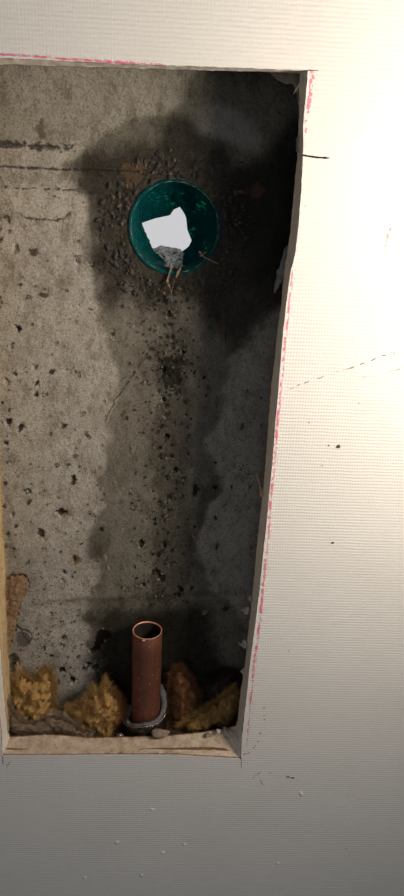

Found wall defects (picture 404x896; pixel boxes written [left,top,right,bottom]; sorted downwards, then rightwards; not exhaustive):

damp [86,123,298,337]
damp [95,610,222,713]